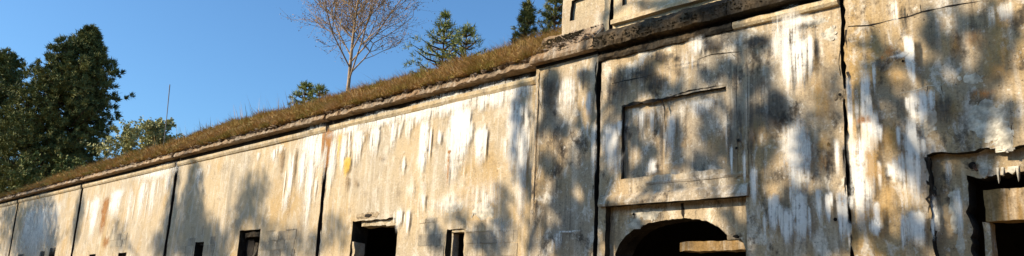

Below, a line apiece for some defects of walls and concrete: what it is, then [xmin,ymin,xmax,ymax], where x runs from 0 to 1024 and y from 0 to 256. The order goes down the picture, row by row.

corrosion [100,198,109,246]
leakage [86,166,177,237]
corrosion [321,129,333,167]
leakage [257,68,591,232]
leakage [727,11,952,245]
crack [839,0,983,256]
leakage [955,190,963,231]
leakage [979,166,1020,182]